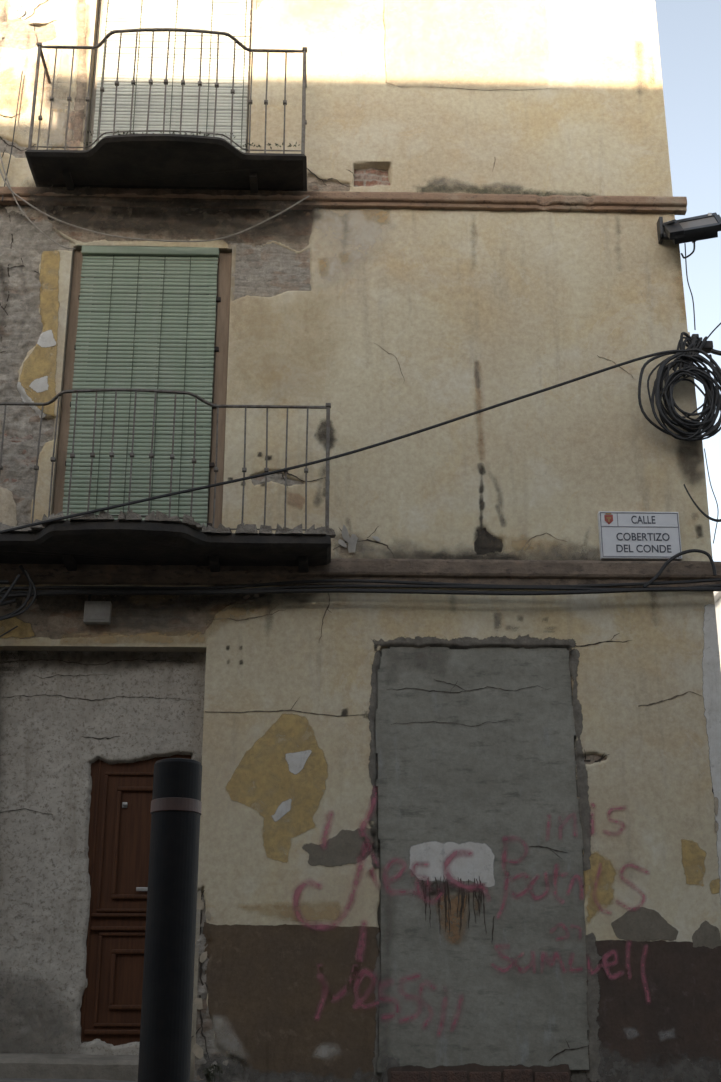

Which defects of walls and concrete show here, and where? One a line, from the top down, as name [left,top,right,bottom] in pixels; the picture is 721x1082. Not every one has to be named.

flaking render [0,0,57,50]
crack [24,0,57,46]
flaking render [53,0,87,150]
peeling [336,212,387,243]
flaking render [0,205,358,553]
crack [638,691,701,707]
peeling [681,604,721,904]
peeling [226,714,381,932]
peeling [582,851,616,922]
peeling [611,907,678,942]
peeling [692,921,721,949]